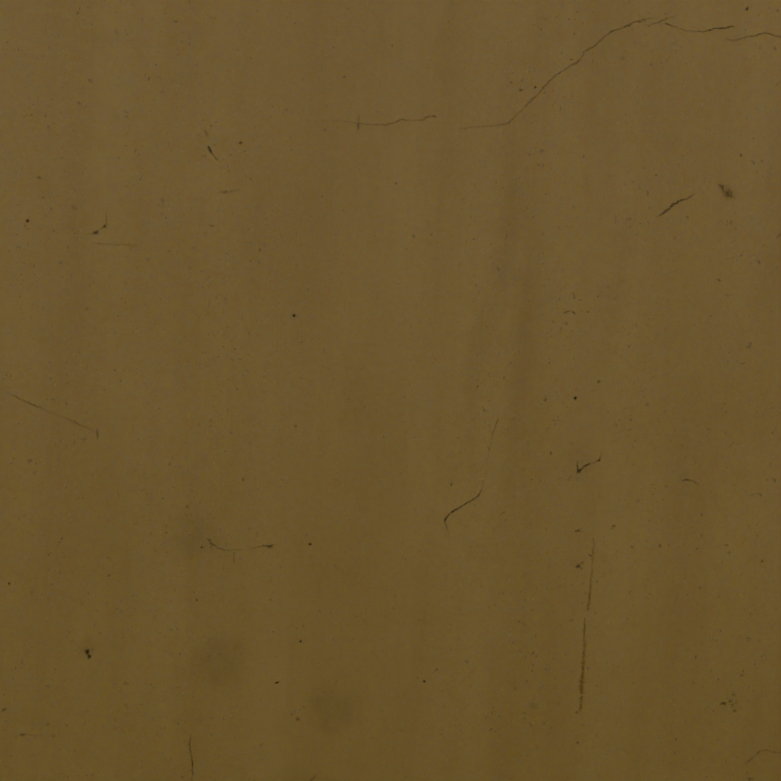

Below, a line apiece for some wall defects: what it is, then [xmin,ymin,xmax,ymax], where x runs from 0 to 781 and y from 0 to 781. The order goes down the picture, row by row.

crack [458,12,781,134]
crack [657,191,696,218]
crack [441,478,488,538]